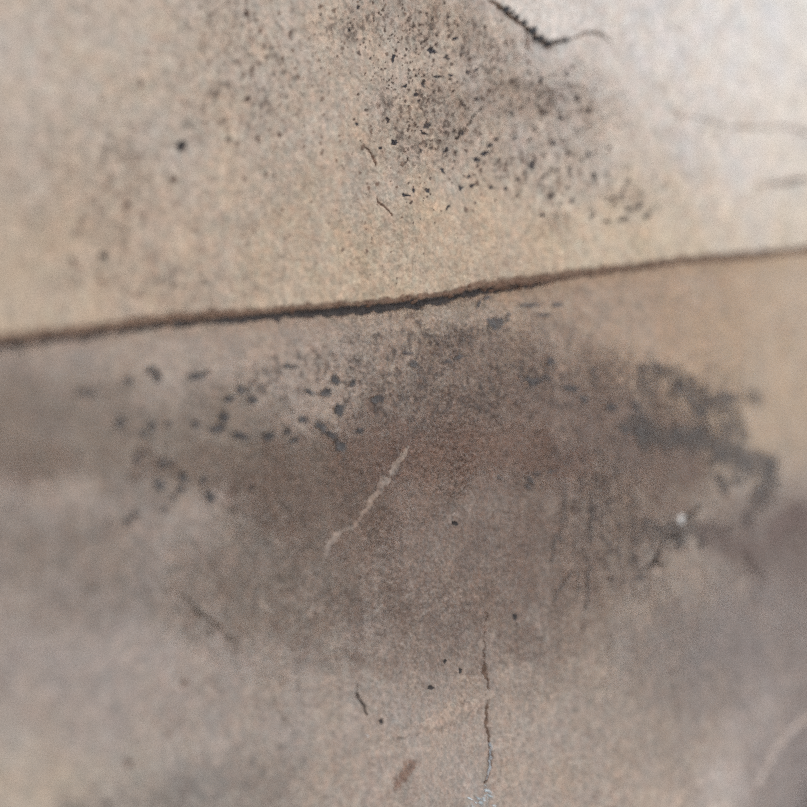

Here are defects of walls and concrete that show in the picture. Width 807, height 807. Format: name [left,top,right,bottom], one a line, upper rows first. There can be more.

crack [489,1,610,51]
crack [0,245,807,350]
leakage [239,331,807,659]
crack [355,682,368,716]
crack [481,612,493,783]